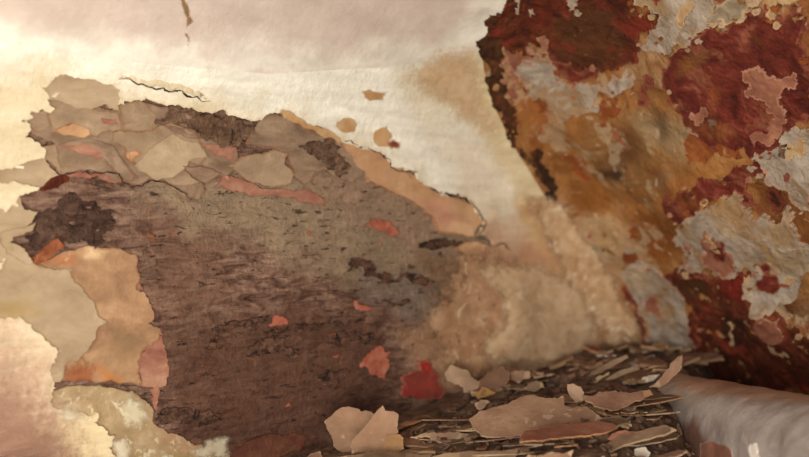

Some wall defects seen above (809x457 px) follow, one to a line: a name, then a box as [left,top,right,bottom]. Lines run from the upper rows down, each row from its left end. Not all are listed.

corrosion [496,0,659,85]
water stain [418,52,495,132]
flaking render [476,0,693,348]
corrosion [661,134,766,225]
peeling [0,74,618,457]
corrosion [622,252,638,265]
corrosion [663,267,809,394]
water stain [114,439,130,457]
water stain [123,399,147,425]
water stain [196,439,227,457]
peeling [565,384,682,418]
peeling [595,425,679,457]